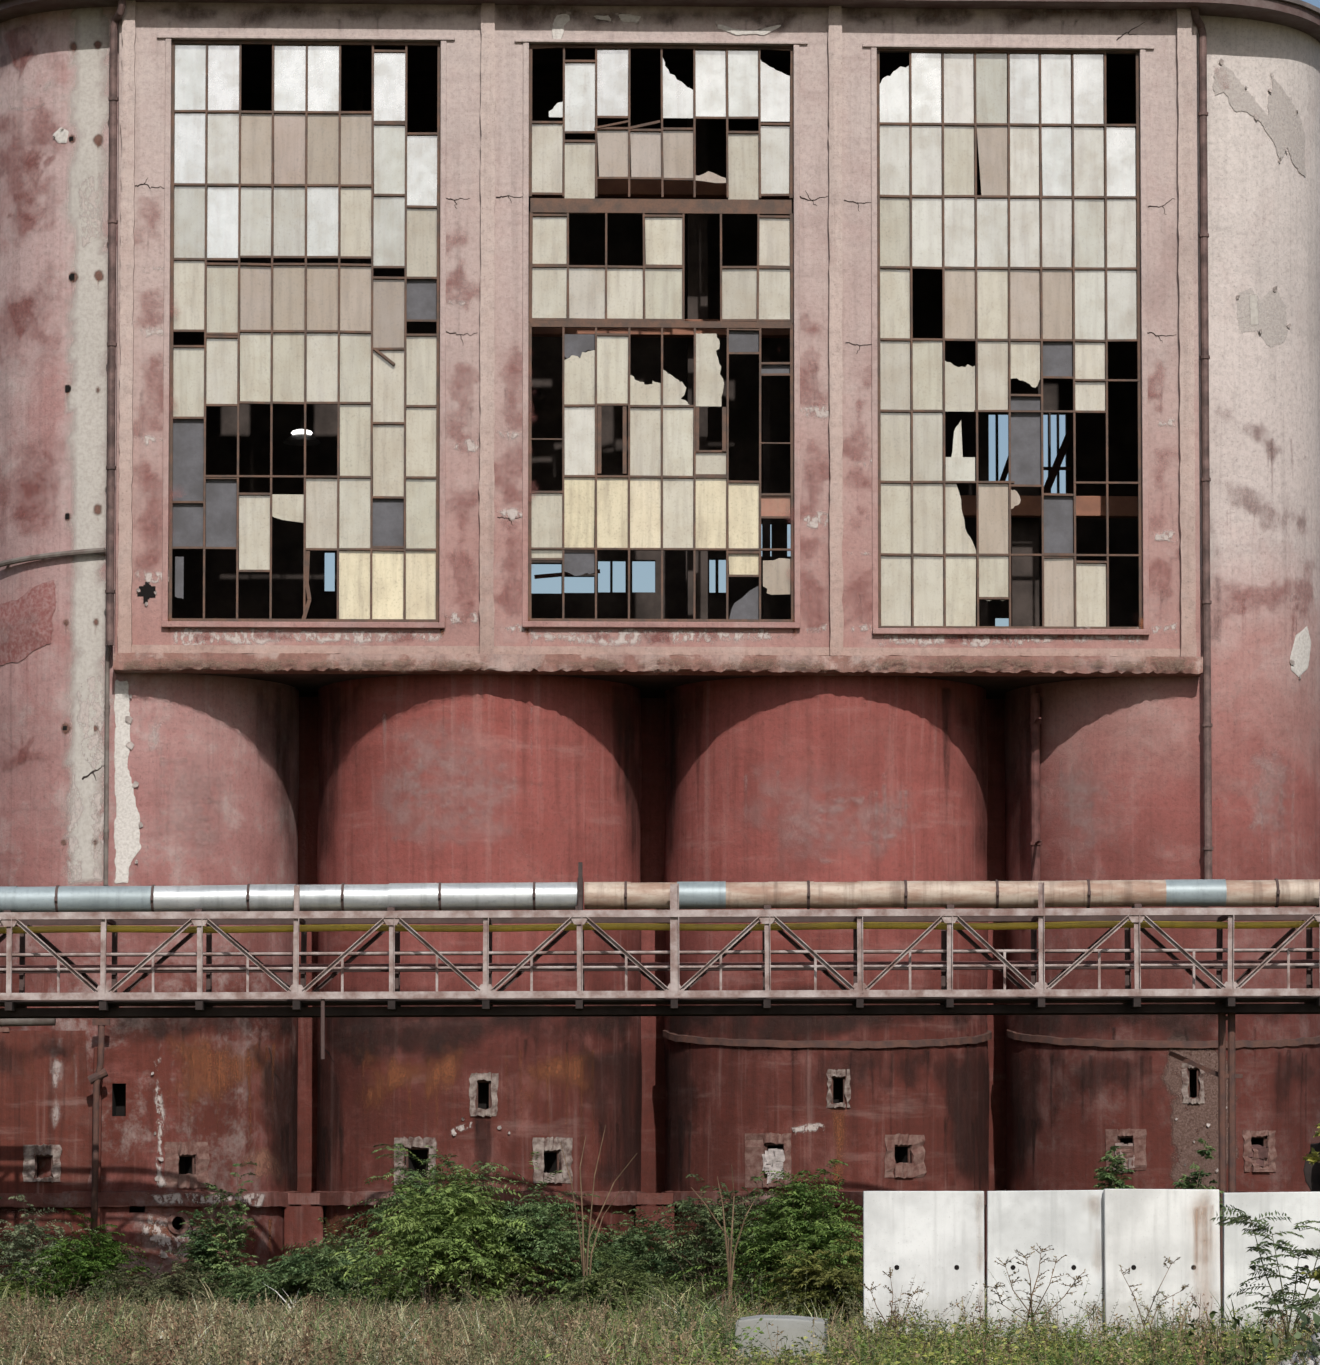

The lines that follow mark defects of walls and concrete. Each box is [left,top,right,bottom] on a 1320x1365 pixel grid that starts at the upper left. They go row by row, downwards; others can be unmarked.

peeling [1213,59,1306,177]
crack [446,195,523,208]
crack [800,190,871,212]
peeling [1236,286,1291,347]
peeling [36,8,143,883]
spalling [1290,626,1311,679]
rust [367,1056,456,1104]
flaking render [1162,1034,1269,1188]